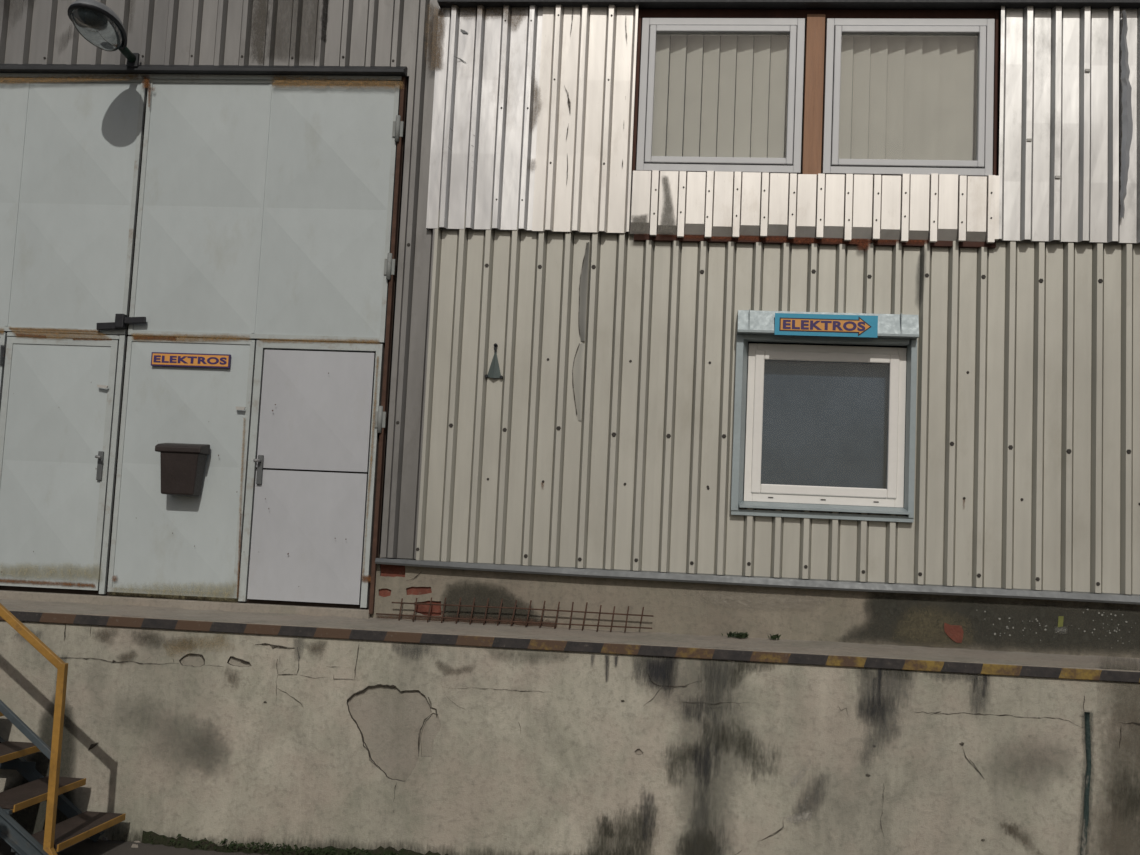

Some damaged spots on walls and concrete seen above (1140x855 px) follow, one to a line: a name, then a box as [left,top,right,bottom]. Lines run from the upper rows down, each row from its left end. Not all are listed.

damp [252,0,328,63]
flaking render [378,564,442,616]
damp [844,594,1140,653]
flaking render [347,684,441,782]
damp [670,661,768,855]
crack [917,695,1085,726]
damp [1099,682,1140,855]